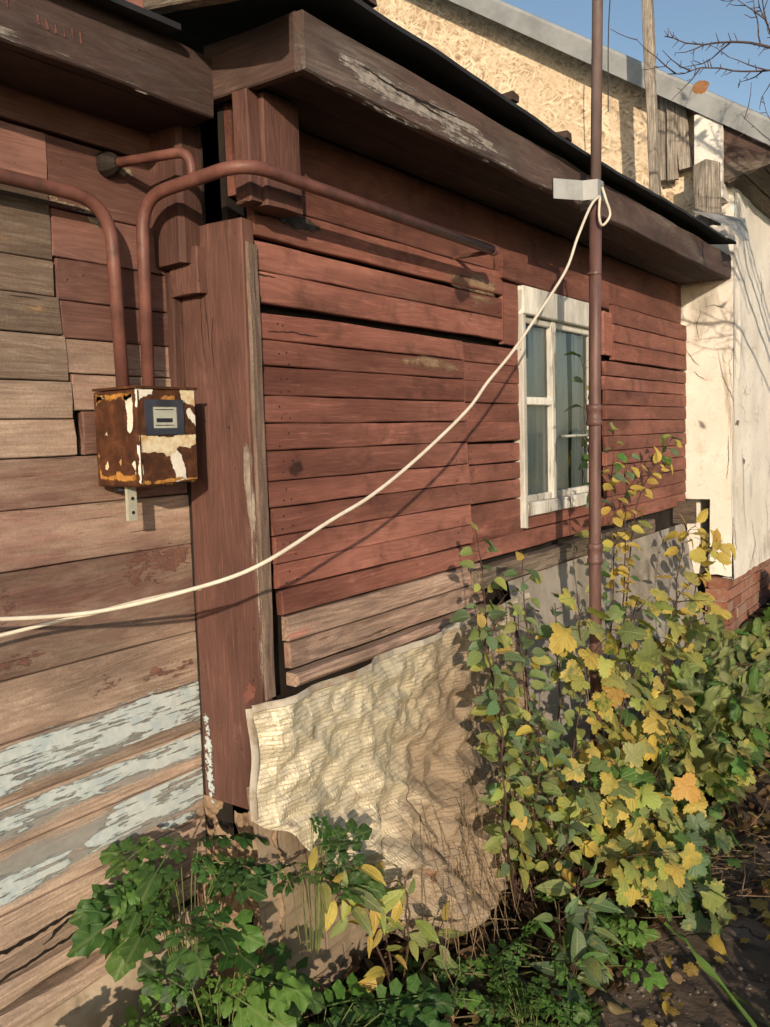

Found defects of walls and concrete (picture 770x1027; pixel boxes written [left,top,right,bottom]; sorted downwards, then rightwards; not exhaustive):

peeling [339,53,516,172]
peeling [0,658,215,906]
crack [0,909,76,983]